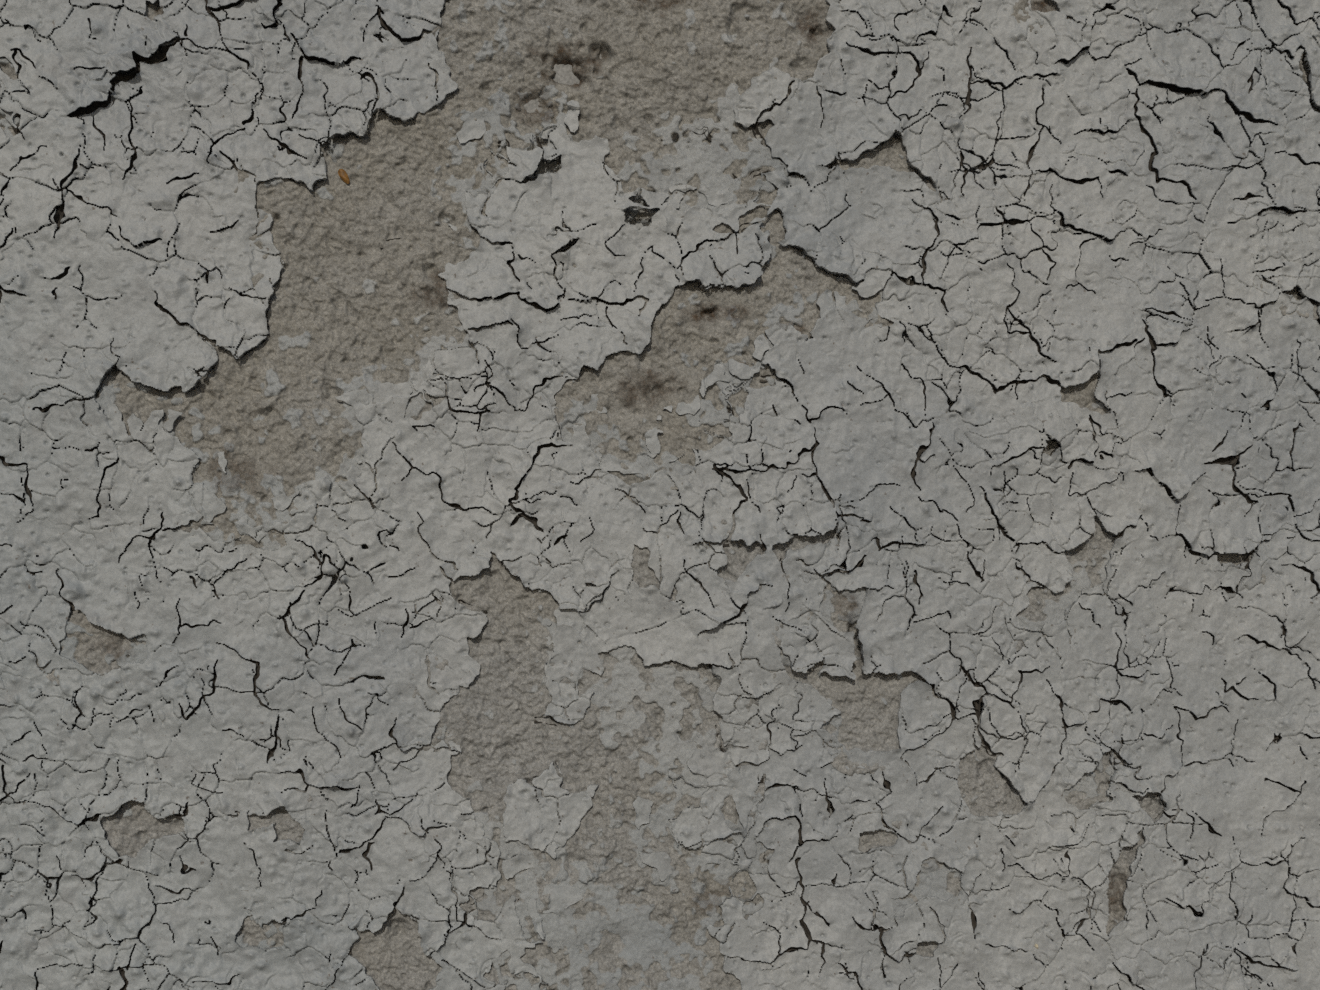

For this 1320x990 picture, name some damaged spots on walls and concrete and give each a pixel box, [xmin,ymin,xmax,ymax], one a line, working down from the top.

crack [0,391,97,621]
crack [0,652,250,990]
peeling [84,778,208,875]
crack [0,0,444,349]
crack [110,506,462,990]
peeling [339,890,461,990]
crack [428,877,499,990]
peeling [69,0,960,551]
peeling [407,498,947,990]
crack [270,0,1320,666]
peeling [832,808,985,968]
crack [567,256,1320,990]